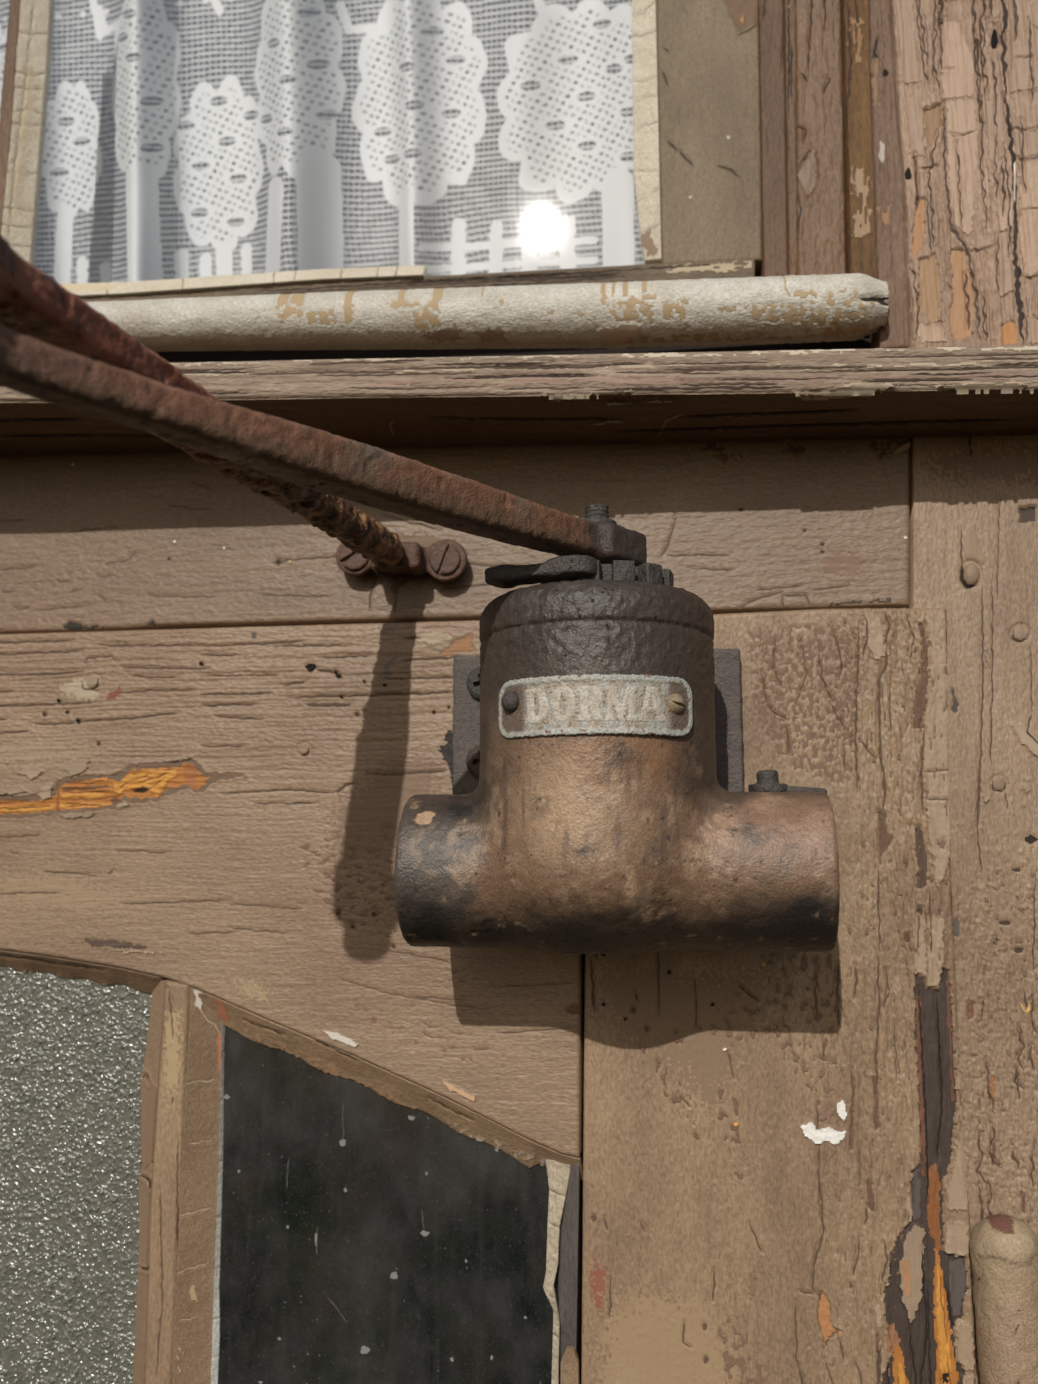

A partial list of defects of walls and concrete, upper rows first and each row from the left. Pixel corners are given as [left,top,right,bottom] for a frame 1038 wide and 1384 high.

peeling [846,16,881,106]
peeling [850,166,891,237]
peeling [666,261,752,273]
peeling [387,288,444,333]
peeling [601,276,875,344]
crack [661,498,1038,870]
peeling [0,741,243,819]
peeling [698,608,1038,1384]